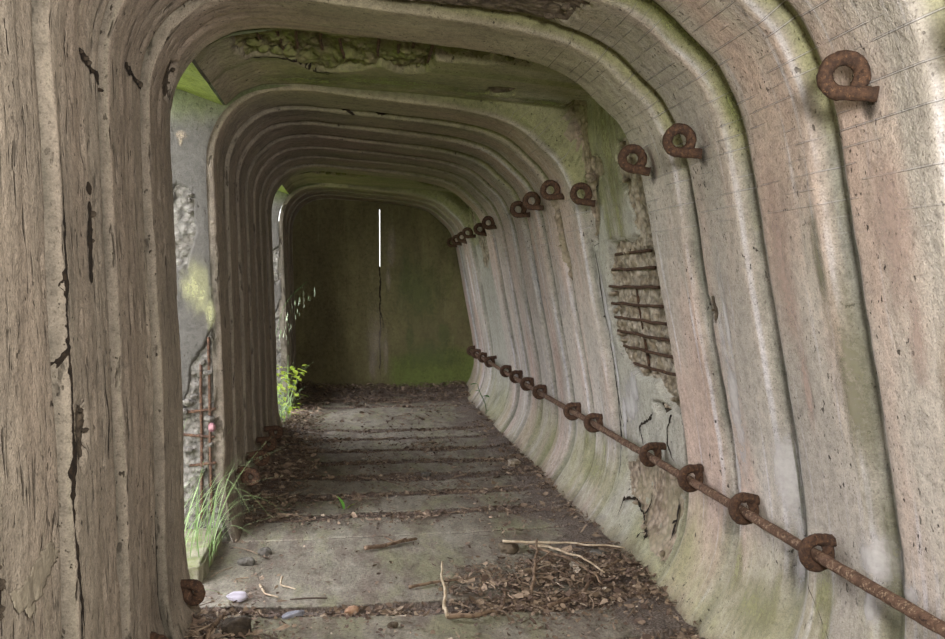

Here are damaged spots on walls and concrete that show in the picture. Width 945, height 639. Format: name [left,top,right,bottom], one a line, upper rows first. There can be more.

spalling [420,0,589,21]
rust [864,101,875,117]
spalling [561,100,605,236]
crack [377,266,385,375]
crack [594,243,674,471]
spalling [608,137,681,413]
crack [618,495,680,540]